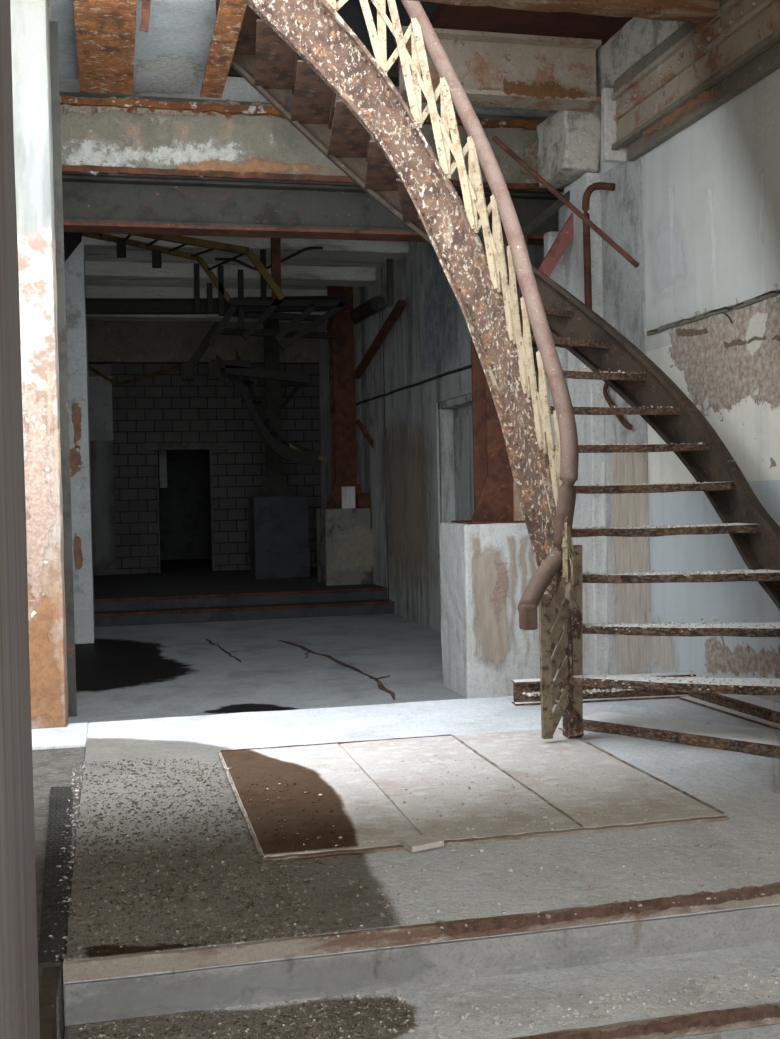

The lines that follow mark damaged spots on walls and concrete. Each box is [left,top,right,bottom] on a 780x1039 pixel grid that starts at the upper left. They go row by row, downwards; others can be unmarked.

rust [503,77,590,100]
peeling [668,280,780,422]
rust [47,374,59,494]
rust [29,560,63,720]
crack [206,639,241,662]
crack [279,640,395,700]
water stain [472,538,534,668]
water stain [220,749,357,854]
rust [436,882,780,936]
rust [524,1004,780,1039]